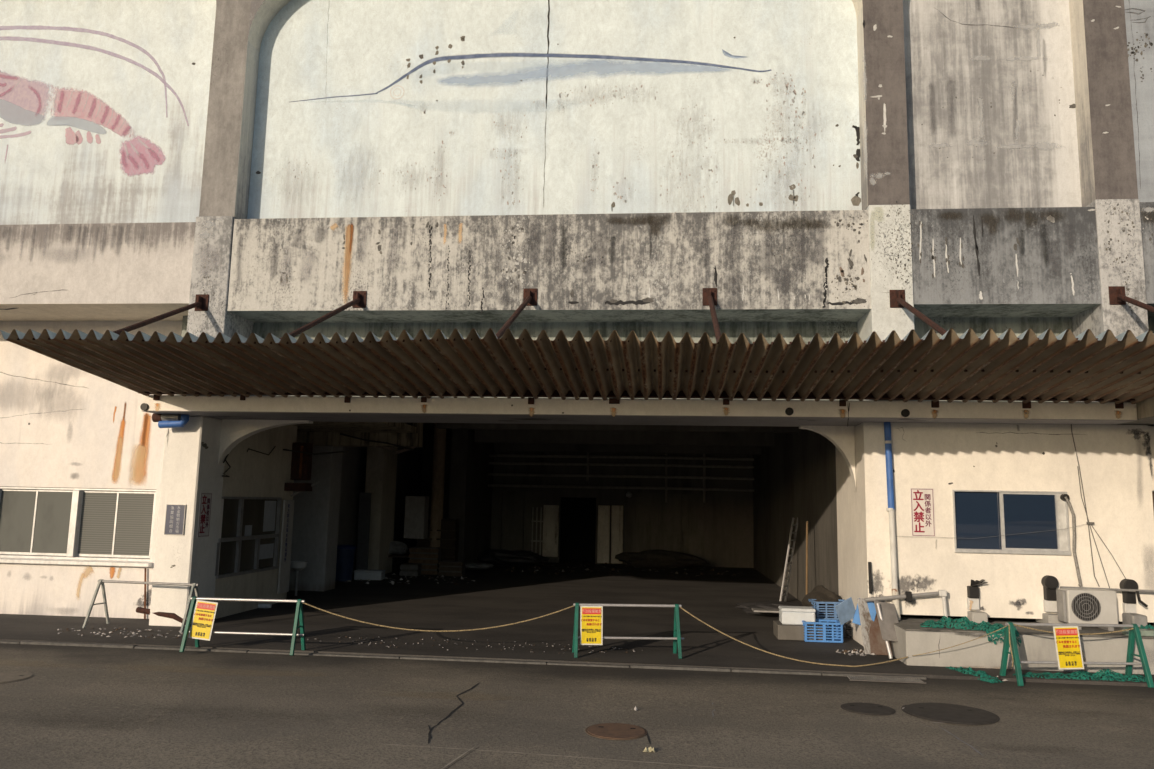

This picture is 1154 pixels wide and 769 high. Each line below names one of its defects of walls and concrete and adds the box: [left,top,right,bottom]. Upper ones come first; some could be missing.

crack [542,0,550,206]
corrosion [331,224,353,296]
corrosion [112,403,126,481]
corrosion [133,403,159,482]
leakage [1142,432,1152,475]